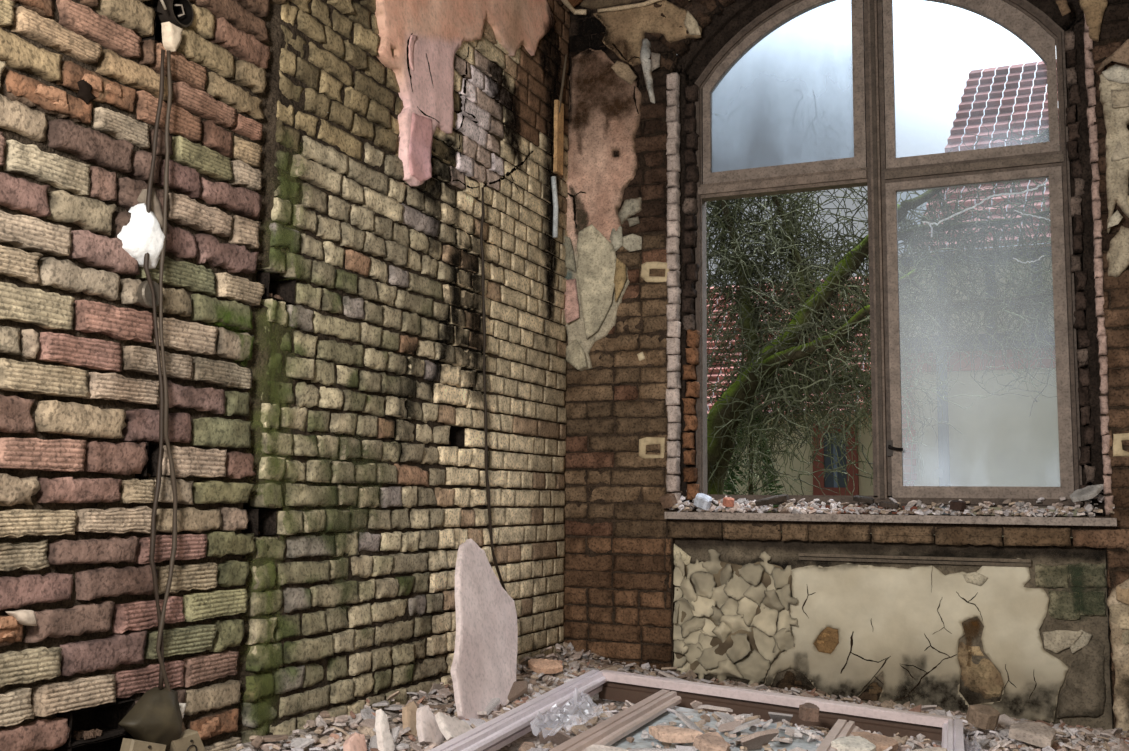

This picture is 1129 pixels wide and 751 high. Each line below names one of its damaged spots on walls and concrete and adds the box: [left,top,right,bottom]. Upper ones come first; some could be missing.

peeling [375,0,554,187]
water stain [484,61,522,168]
peeling [563,0,702,371]
peeling [1097,39,1129,277]
peeling [674,544,691,568]
crack [841,564,983,702]
peeling [764,558,1092,722]
crack [1001,664,1036,699]